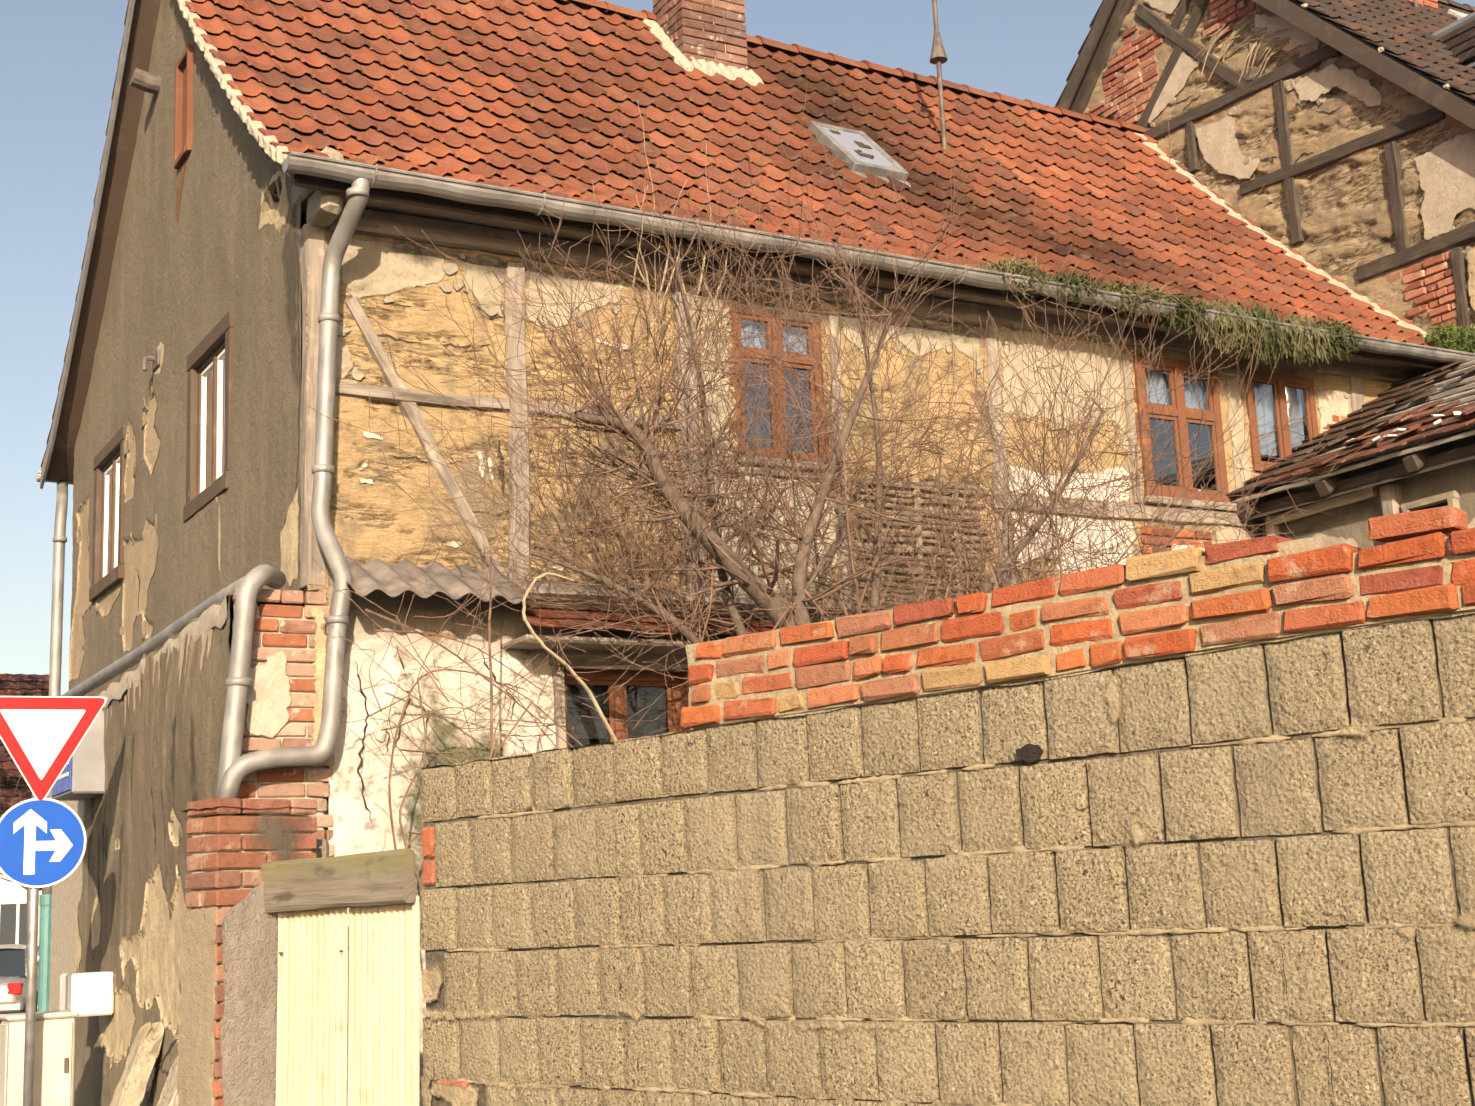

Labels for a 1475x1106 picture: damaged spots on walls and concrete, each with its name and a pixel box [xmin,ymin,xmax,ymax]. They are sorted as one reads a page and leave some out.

flaking render [1090,0,1201,127]
peeling [1203,0,1382,107]
flaking render [258,170,289,234]
peeling [1196,107,1260,179]
peeling [1414,126,1475,242]
flaking render [1387,246,1475,342]
peeling [123,341,164,503]
peeling [69,495,159,681]
peeling [1305,533,1358,549]
peeling [246,651,292,738]
crack [354,648,429,822]
peeling [97,807,191,1070]